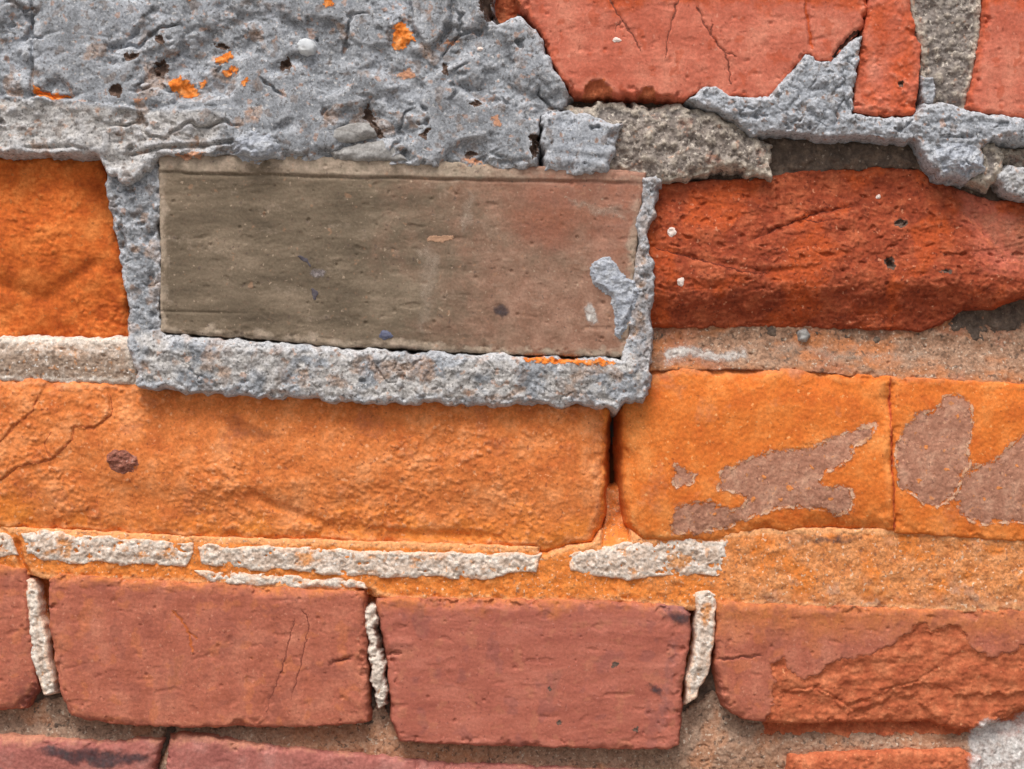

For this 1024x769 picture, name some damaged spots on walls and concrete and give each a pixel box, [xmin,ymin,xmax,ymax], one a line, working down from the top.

crack [609,0,737,84]
crack [0,394,113,480]
peeling [670,422,877,536]
peeling [891,392,1024,526]
crack [266,609,310,712]
spalling [760,622,1024,738]